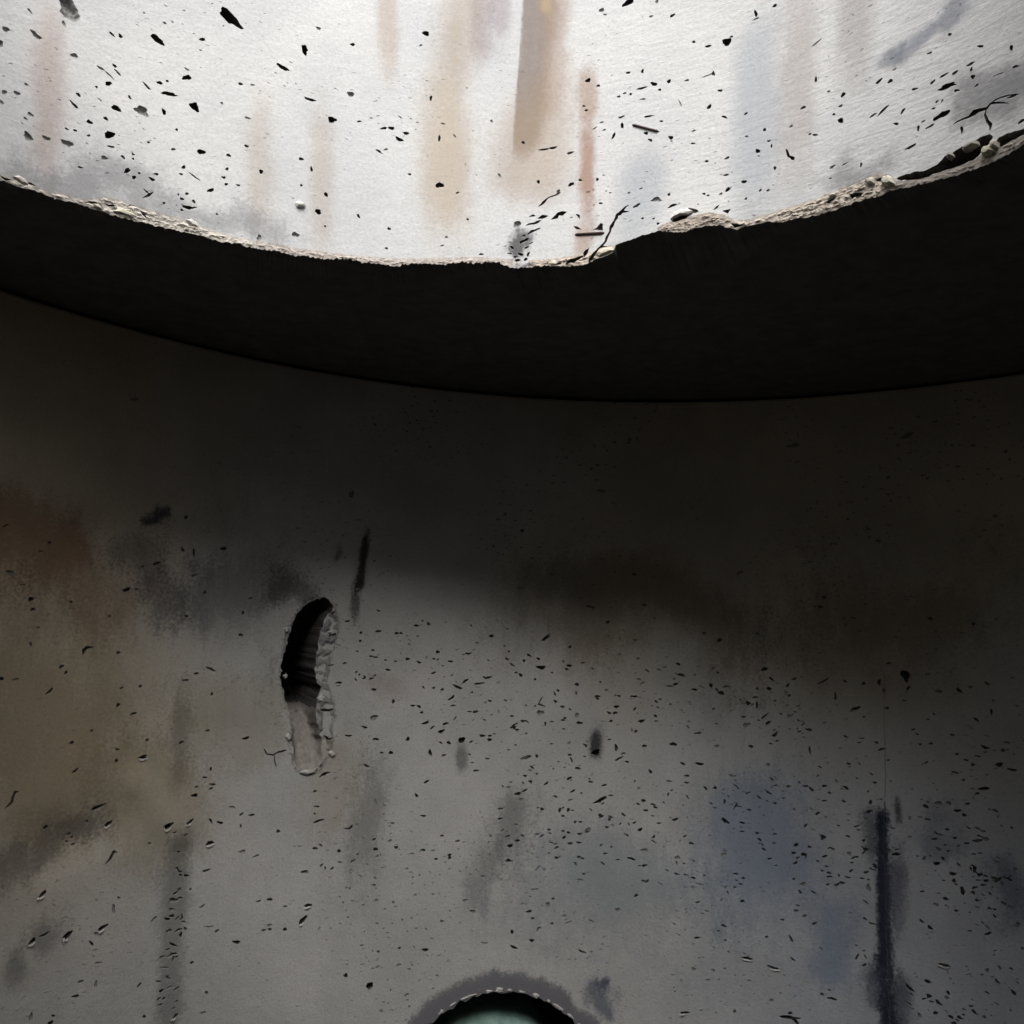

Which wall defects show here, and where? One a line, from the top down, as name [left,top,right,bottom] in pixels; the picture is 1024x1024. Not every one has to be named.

hole [357,115,409,154]
crack [953,94,1018,130]
hole [179,154,240,192]
spalling [628,119,1024,232]
peeling [0,174,615,268]
crack [523,192,629,265]
water stain [354,533,369,592]
spalling [285,610,342,775]
water stain [874,800,901,1024]